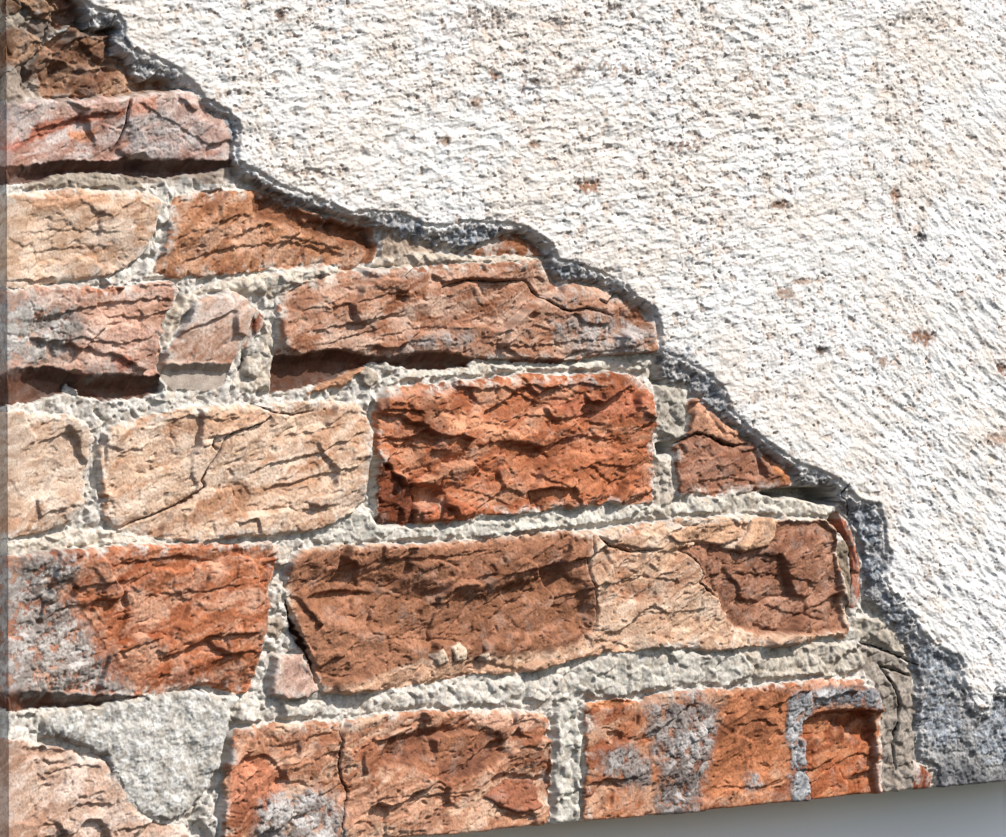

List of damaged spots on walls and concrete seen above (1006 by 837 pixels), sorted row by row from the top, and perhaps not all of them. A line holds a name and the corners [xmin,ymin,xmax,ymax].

spalling [76,0,200,96]
crack [127,404,310,525]
spalling [200,99,1006,799]
spalling [74,549,269,685]
crack [859,642,920,766]
spalling [483,778,543,814]